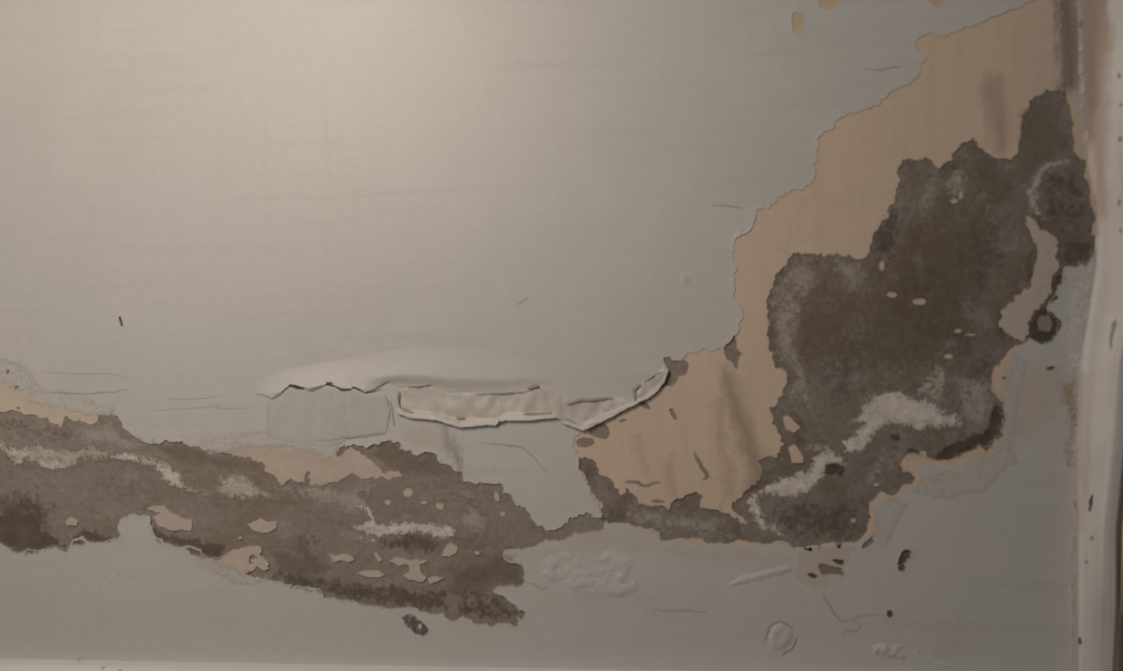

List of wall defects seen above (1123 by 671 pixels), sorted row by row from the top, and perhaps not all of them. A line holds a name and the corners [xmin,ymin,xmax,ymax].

crack [42,372,127,395]
damp [154,530,224,557]
damp [0,384,529,552]
crack [151,382,380,437]
damp [280,538,446,608]
spalling [0,90,1097,627]
peeling [573,0,1066,519]
damp [768,252,876,417]
damp [747,352,1027,536]